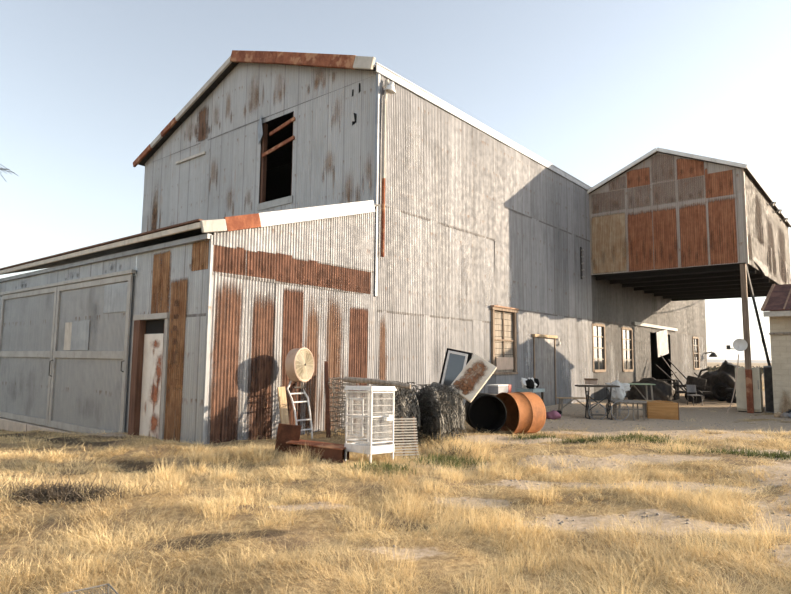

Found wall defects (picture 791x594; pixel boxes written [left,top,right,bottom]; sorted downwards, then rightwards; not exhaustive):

corrosion [195,106,216,142]
corrosion [591,155,738,274]
corrosion [748,196,786,283]
corrosion [145,240,371,444]